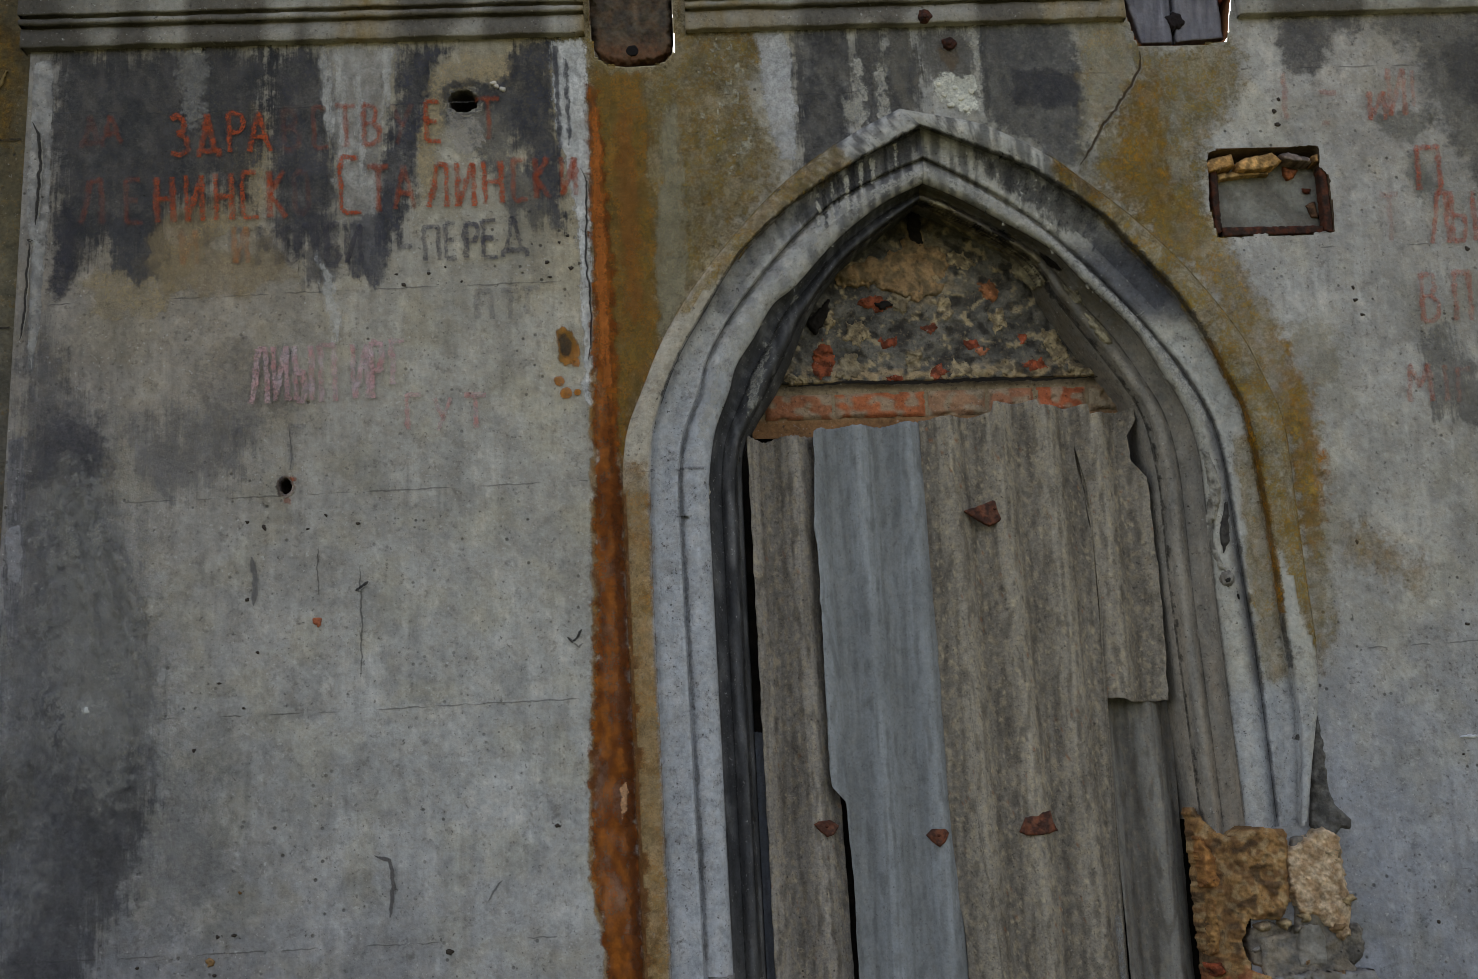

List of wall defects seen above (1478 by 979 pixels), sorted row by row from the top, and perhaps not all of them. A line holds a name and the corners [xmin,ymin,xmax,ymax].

water stain [47,105,283,319]
water stain [300,42,399,337]
spalling [784,196,1113,387]
water stain [974,151,1097,233]
crack [1080,51,1141,165]
water stain [1012,21,1340,525]
corrosion [554,84,671,979]
spalling [1181,807,1357,979]